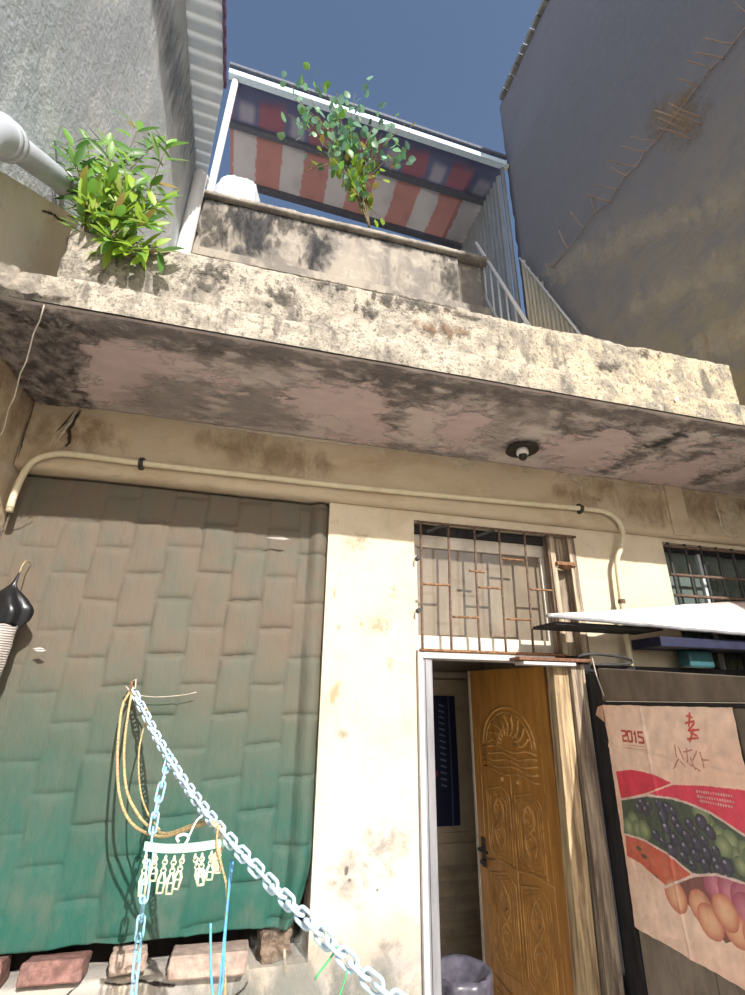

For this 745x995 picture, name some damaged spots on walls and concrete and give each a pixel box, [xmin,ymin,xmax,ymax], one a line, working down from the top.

water stain [184,197,459,319]
crack [17,403,35,458]
crack [53,408,81,447]
water stain [3,302,745,486]